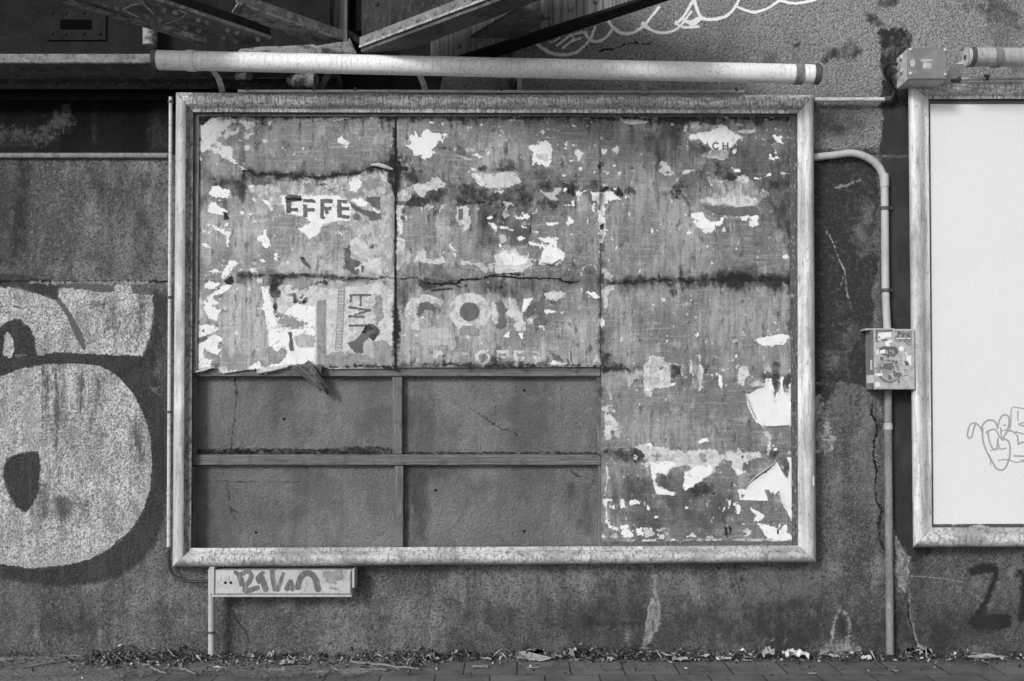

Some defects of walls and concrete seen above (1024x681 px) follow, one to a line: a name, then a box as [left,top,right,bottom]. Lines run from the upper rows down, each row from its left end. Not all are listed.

damp [863,14,912,329]
crack [870,404,885,550]
damp [892,390,931,593]